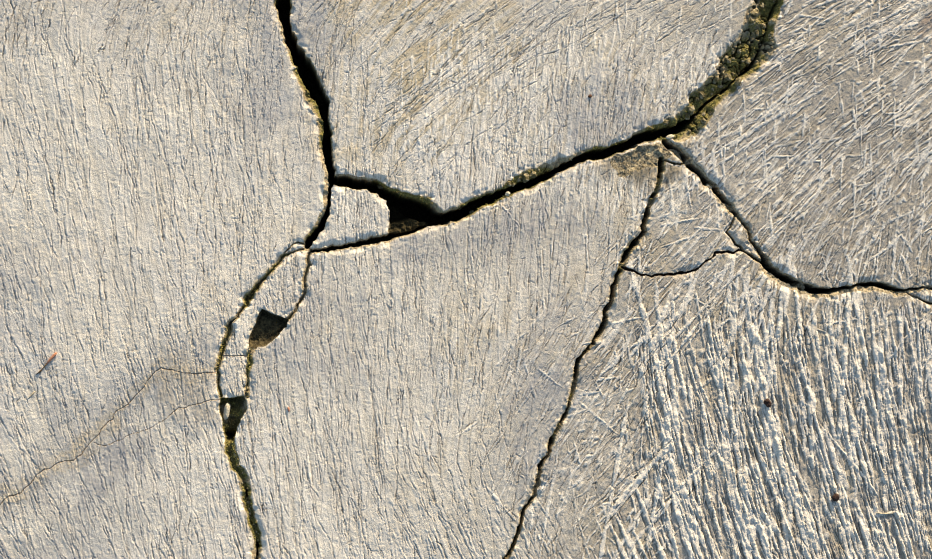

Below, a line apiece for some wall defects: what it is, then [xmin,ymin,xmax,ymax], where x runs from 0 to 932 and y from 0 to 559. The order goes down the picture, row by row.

crack [0,0,394,505]
crack [222,416,262,559]
crack [331,0,932,559]